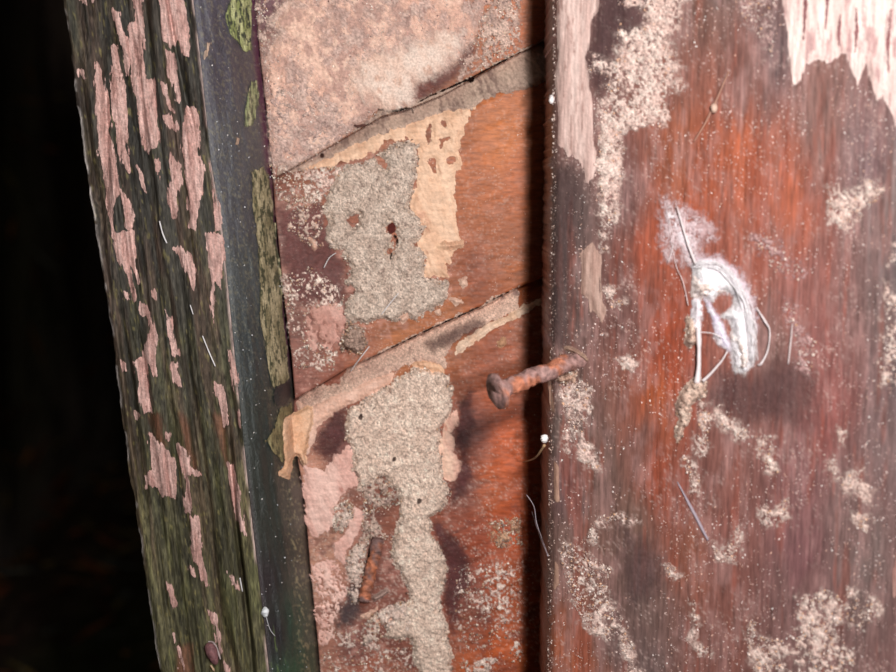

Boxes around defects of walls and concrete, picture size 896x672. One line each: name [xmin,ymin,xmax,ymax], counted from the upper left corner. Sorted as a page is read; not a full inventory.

peeling [226,0,252,52]
peeling [782,0,896,126]
peeling [77,0,226,420]
peeling [252,166,290,387]
peeling [301,106,476,288]
peeling [145,432,210,587]
peeling [207,609,230,672]
peeling [214,350,241,429]
peeling [226,461,247,537]
peeling [265,372,394,538]
peeling [309,507,365,646]
peeling [439,410,462,482]